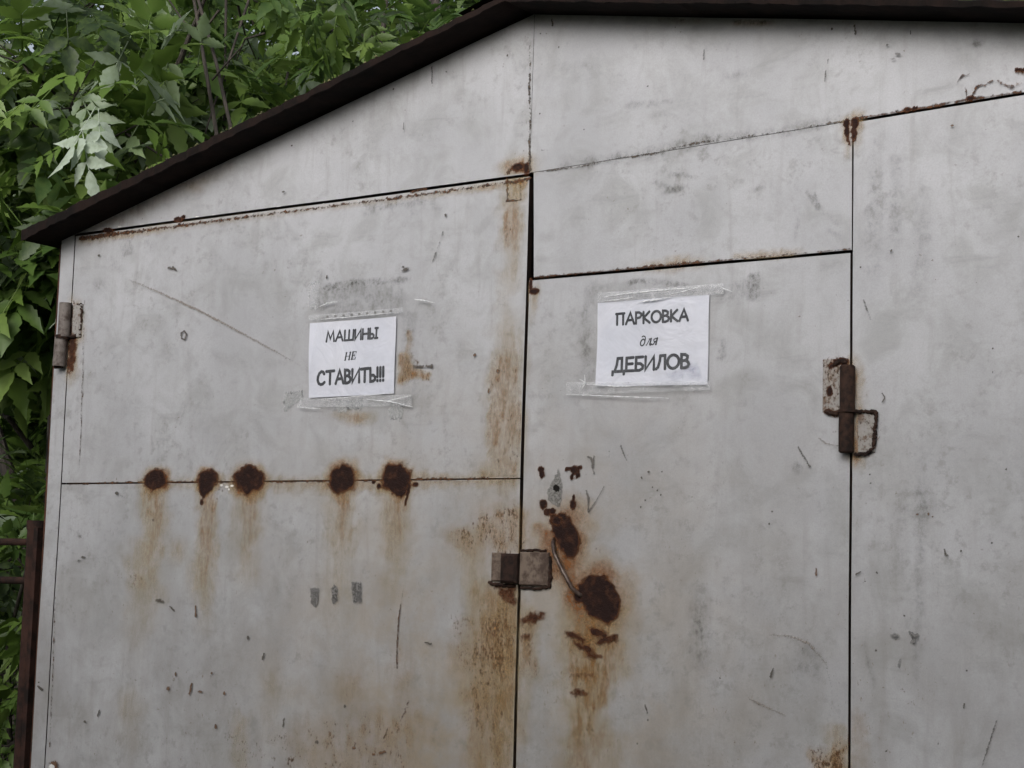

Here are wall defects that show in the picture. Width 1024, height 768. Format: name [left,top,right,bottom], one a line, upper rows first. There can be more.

corrosion [843,67,1024,145]
corrosion [67,301,85,405]
corrosion [70,355,521,516]
corrosion [565,465,582,480]
corrosion [824,357,850,417]
corrosion [536,494,624,713]
corrosion [467,587,544,765]